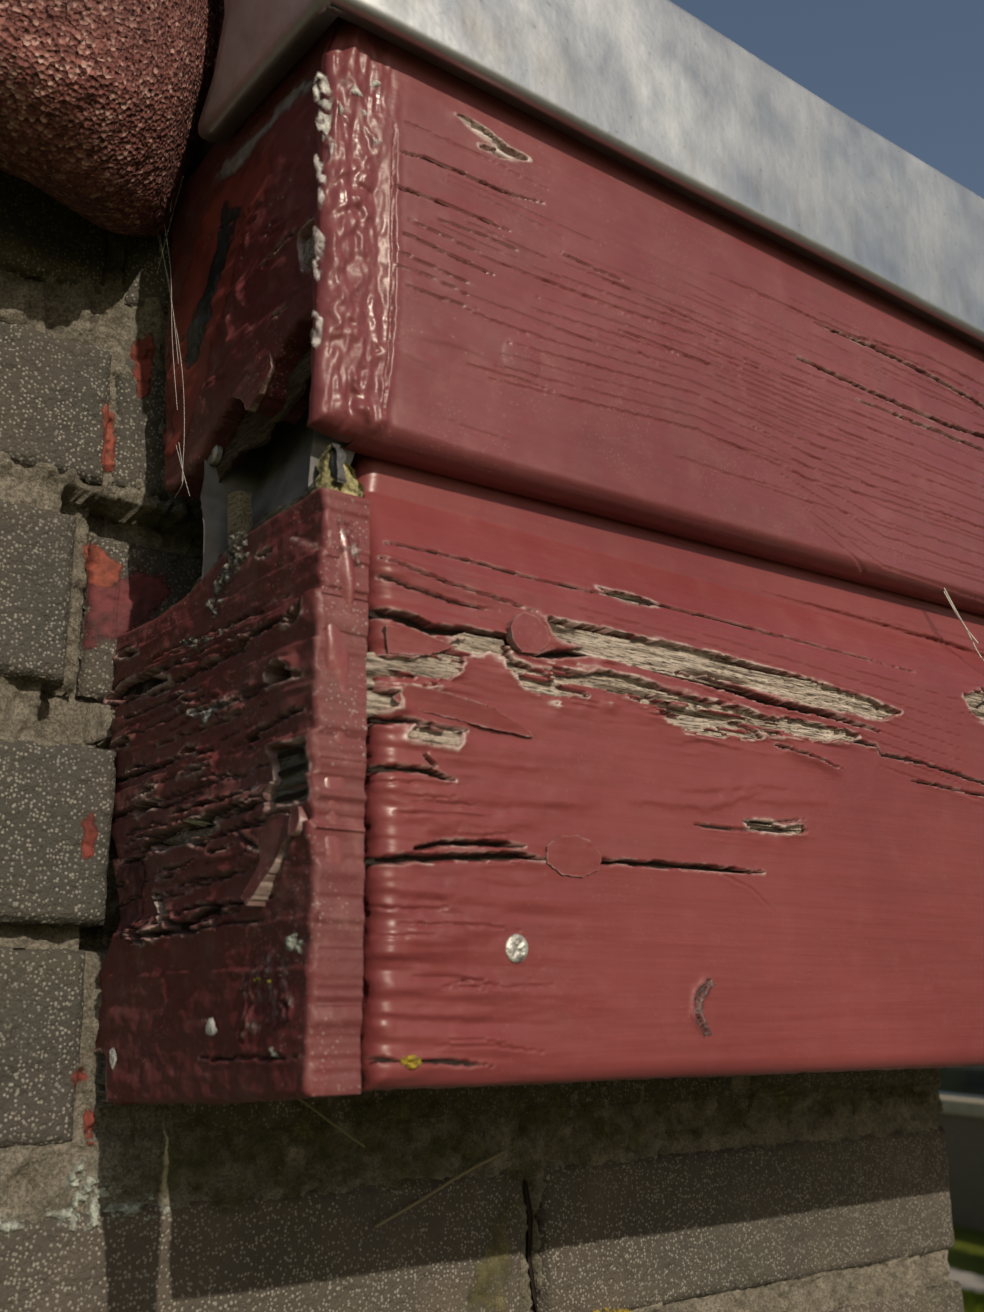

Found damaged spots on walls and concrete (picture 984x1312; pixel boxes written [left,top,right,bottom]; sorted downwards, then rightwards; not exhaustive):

spalling [458,116,523,161]
peeling [302,229,325,279]
peeling [313,312,323,346]
peeling [231,350,275,413]
crack [368,544,815,658]
peeling [366,622,895,747]
crack [674,677,983,796]
peeling [241,744,308,907]
crack [364,841,536,865]
crack [600,860,757,873]
crack [694,820,802,832]
crack [522,1180,538,1312]